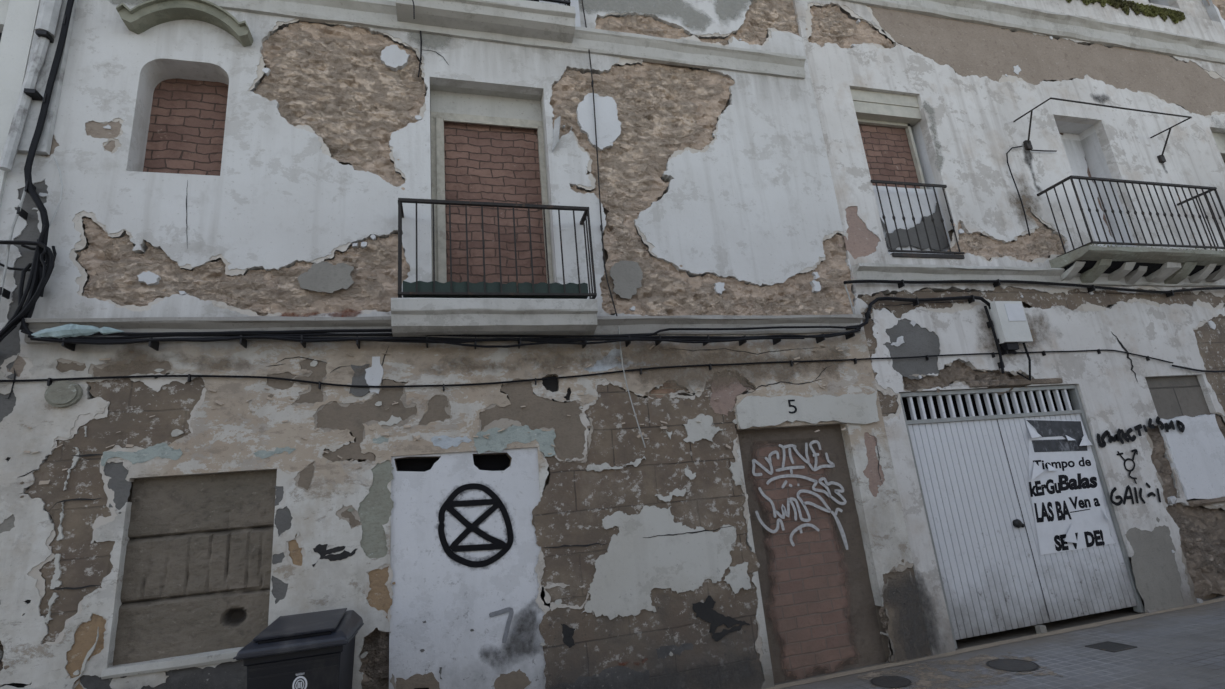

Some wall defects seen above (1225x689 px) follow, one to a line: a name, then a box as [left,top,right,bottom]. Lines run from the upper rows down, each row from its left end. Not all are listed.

peeling [85,118,124,153]
flaking render [249,19,426,190]
flaking render [69,211,410,317]
flaking render [550,57,1225,438]
flaking render [6,358,224,689]
flaking render [253,348,764,689]
peeling [863,432,885,497]
flaking render [1146,425,1225,604]